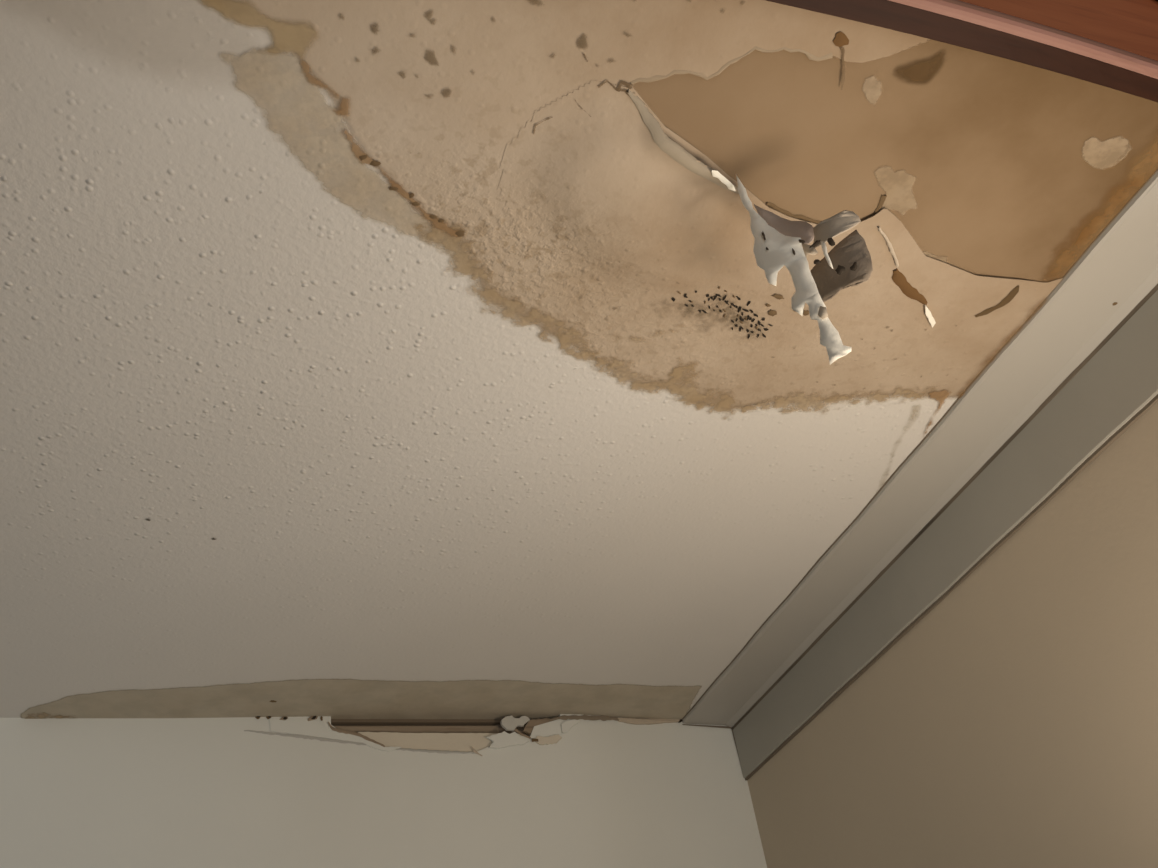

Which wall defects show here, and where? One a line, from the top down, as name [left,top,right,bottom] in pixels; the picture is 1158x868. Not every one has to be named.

leakage [201,0,1063,433]
flaking render [736,175,873,365]
flaking render [308,716,581,756]